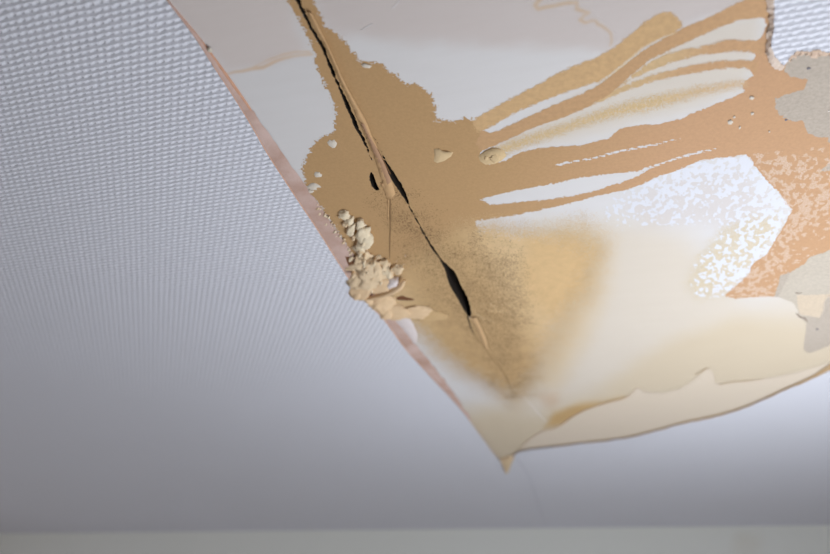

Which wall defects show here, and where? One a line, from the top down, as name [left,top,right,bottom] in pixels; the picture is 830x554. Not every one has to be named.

flaking render [316,204,448,343]
crack [295,0,522,398]
leakage [286,0,830,415]